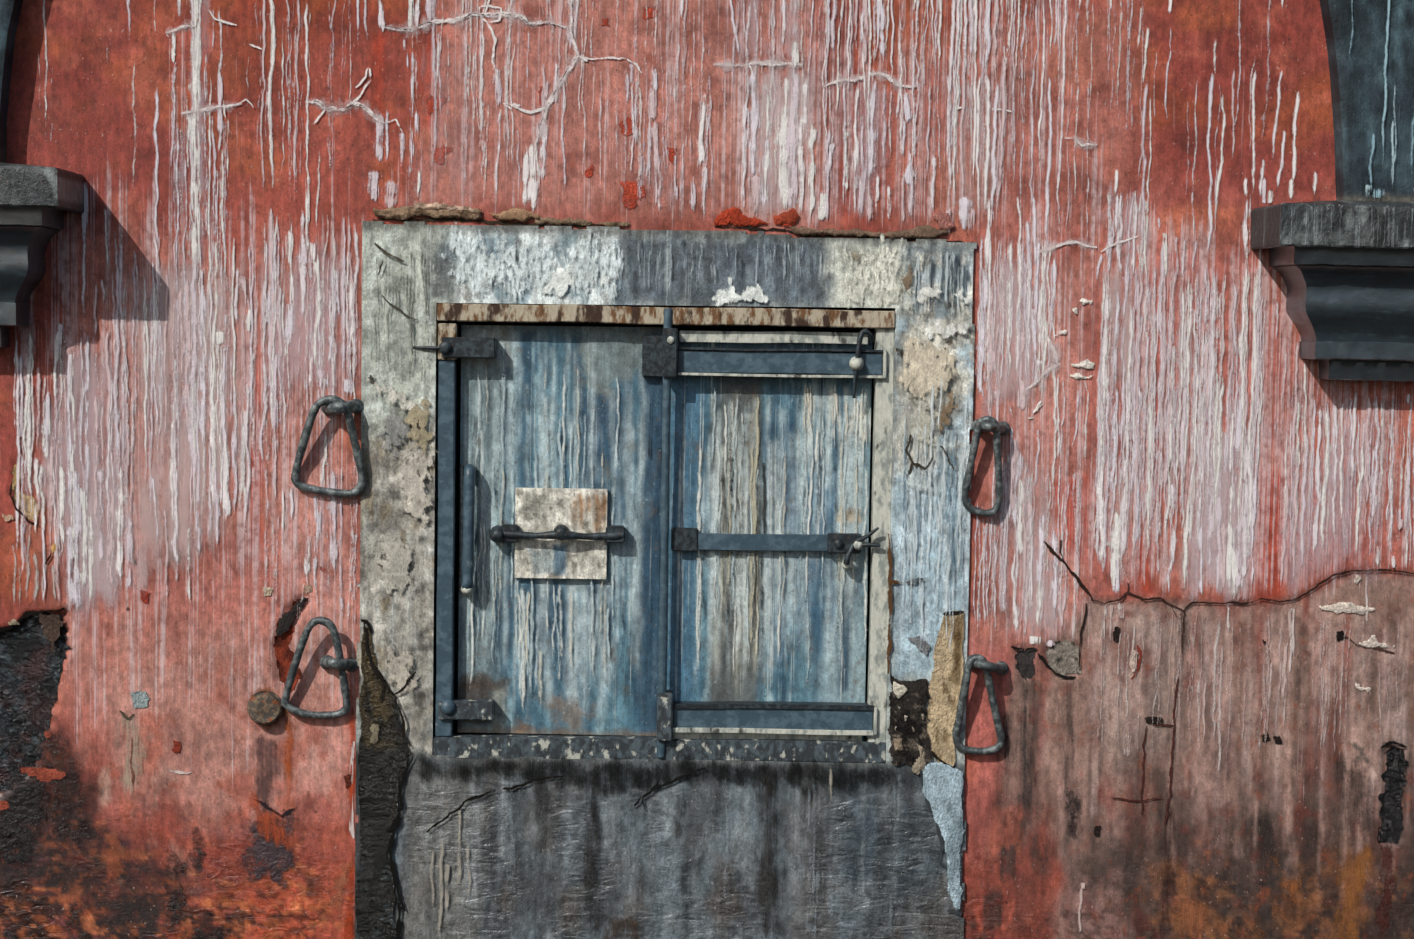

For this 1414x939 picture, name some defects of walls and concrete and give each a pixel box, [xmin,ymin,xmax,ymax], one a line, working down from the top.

crack [307,67,403,132]
crack [384,0,642,154]
peeling [366,375,434,526]
flaking render [0,608,102,848]
rust [252,795,289,848]
rust [265,707,293,781]
rust [344,709,356,839]
flaking render [355,619,417,939]
crack [363,622,564,939]
water stain [419,756,897,939]
peeling [887,610,965,909]
crack [1043,540,1414,825]